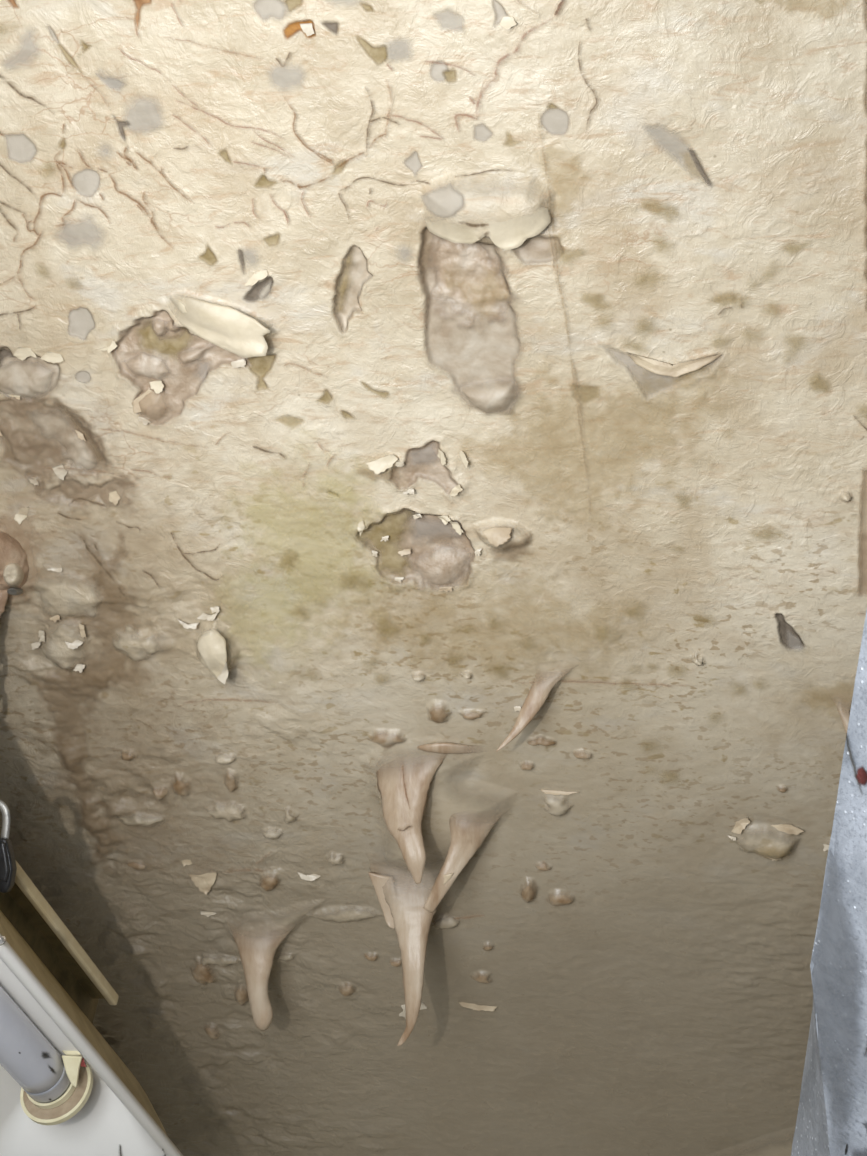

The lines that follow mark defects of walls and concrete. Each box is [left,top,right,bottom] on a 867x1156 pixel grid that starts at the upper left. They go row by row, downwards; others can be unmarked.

crack [578,19,597,123]
crack [173,31,530,228]
crack [0,148,184,322]
spalling [100,310,249,425]
spalling [335,246,372,332]
spalling [420,227,520,413]
spalling [514,237,563,264]
peeling [628,354,722,377]
peeling [0,347,133,506]
spalling [357,441,482,592]
peeling [459,1002,497,1011]